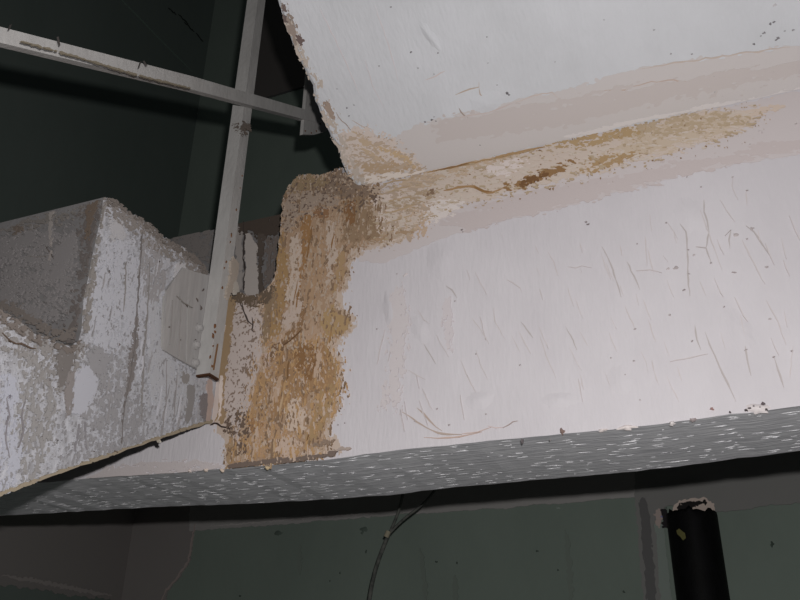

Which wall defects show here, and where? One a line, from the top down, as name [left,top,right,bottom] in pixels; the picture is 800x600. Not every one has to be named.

peeling [0,197,263,497]
spalling [323,100,335,120]
damp [86,3,800,478]